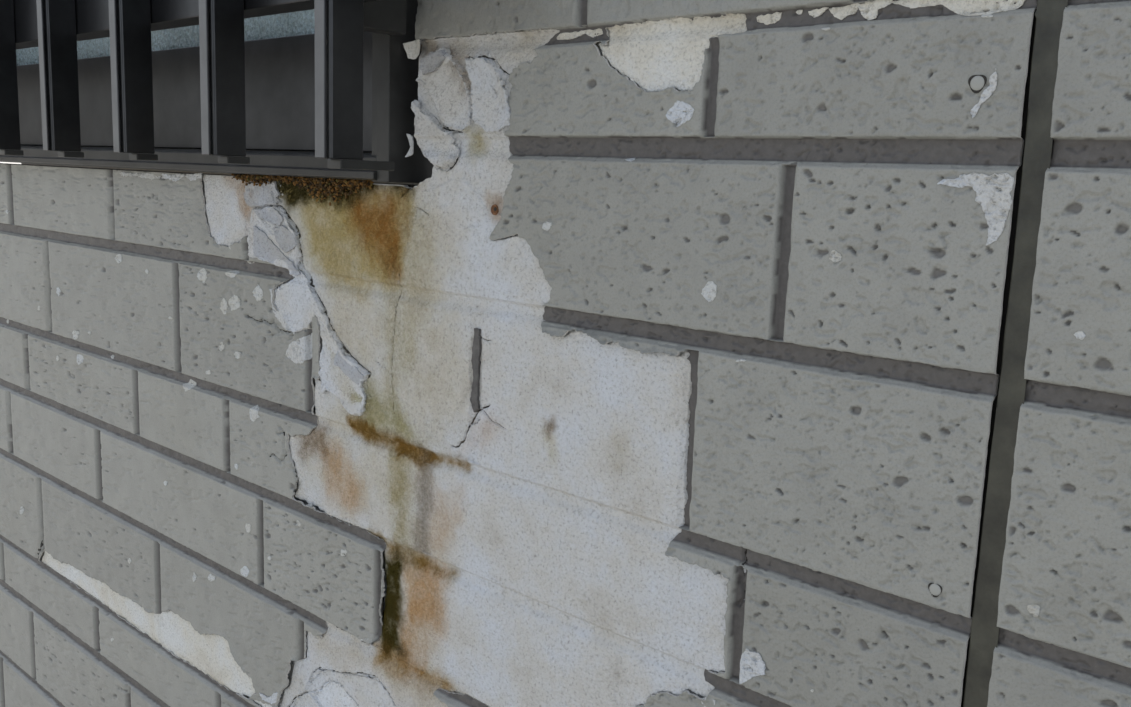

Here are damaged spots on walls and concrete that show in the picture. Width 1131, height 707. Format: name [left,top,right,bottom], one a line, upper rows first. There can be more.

peeling [796,0,1025,30]
peeling [970,68,998,118]
water stain [276,180,376,207]
peeling [937,172,1014,246]
peeling [41,12,782,707]
corrosion [350,421,377,438]
corrosion [396,439,439,462]
crack [453,406,504,448]